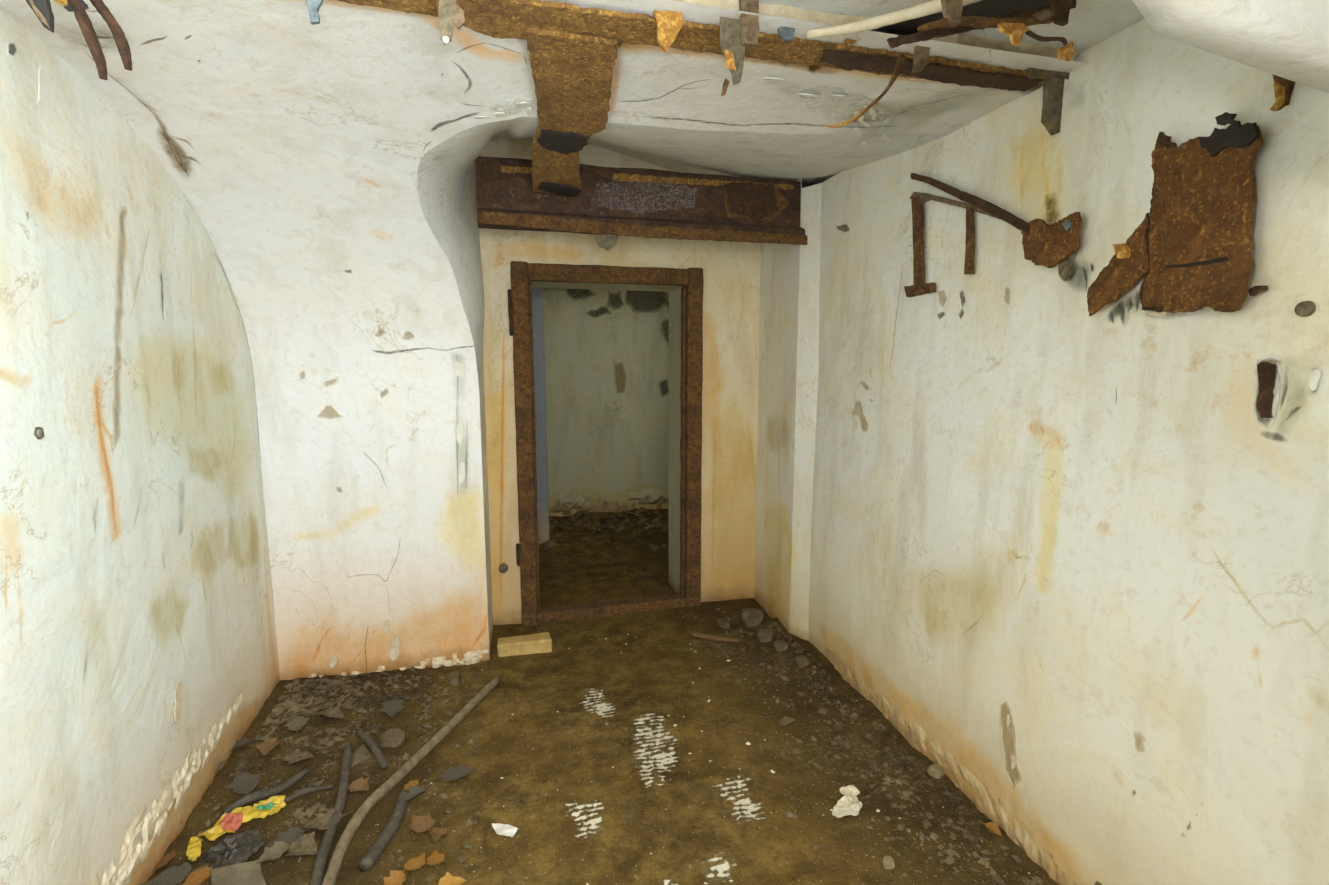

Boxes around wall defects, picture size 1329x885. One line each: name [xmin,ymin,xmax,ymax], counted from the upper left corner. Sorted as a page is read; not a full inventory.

corrosion [452,1,465,30]
corrosion [724,49,736,71]
spalling [1254,354,1284,439]